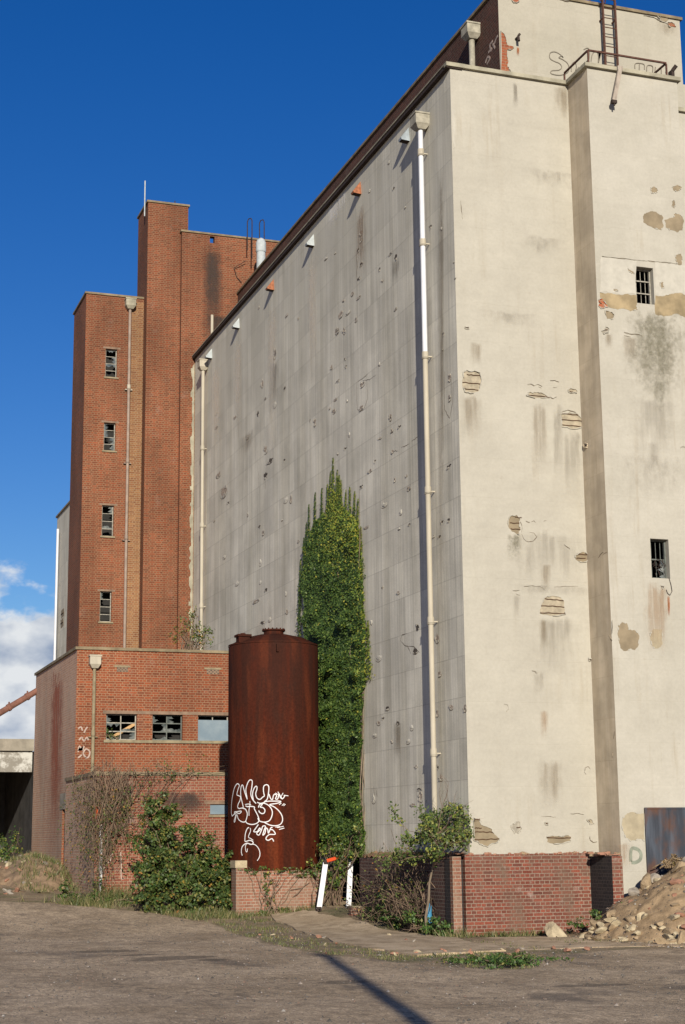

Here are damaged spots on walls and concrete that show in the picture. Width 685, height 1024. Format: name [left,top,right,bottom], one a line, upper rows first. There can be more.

peeling [643,185,684,232]
peeling [598,288,638,335]
peeling [655,282,685,317]
spalling [448,370,482,403]
spalling [561,412,582,429]
spalling [507,514,522,535]
spalling [574,552,588,563]
spalling [540,595,566,616]
peeling [617,622,663,651]
spalling [468,818,620,856]
peeling [621,812,645,841]